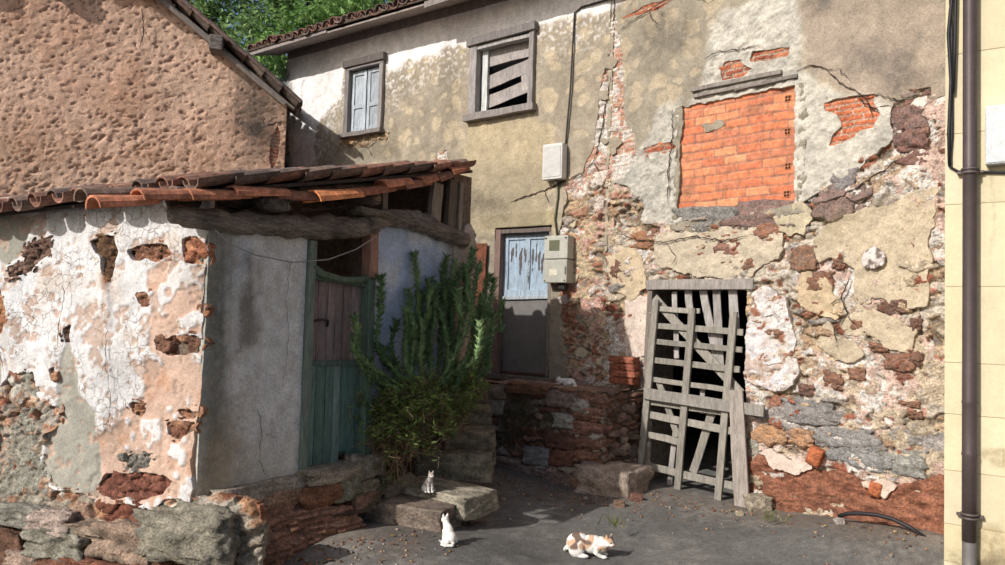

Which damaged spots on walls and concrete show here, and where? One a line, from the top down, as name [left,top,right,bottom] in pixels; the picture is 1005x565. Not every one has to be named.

flaking render [719,48,790,80]
crack [510,0,664,202]
flaking render [572,0,676,189]
flaking render [824,94,880,146]
crack [659,110,674,202]
spalling [4,231,54,281]
spalling [93,230,119,282]
spalling [132,236,216,266]
crack [830,276,856,347]
spalling [154,330,214,356]
spalling [165,405,208,444]
spalling [95,450,172,522]